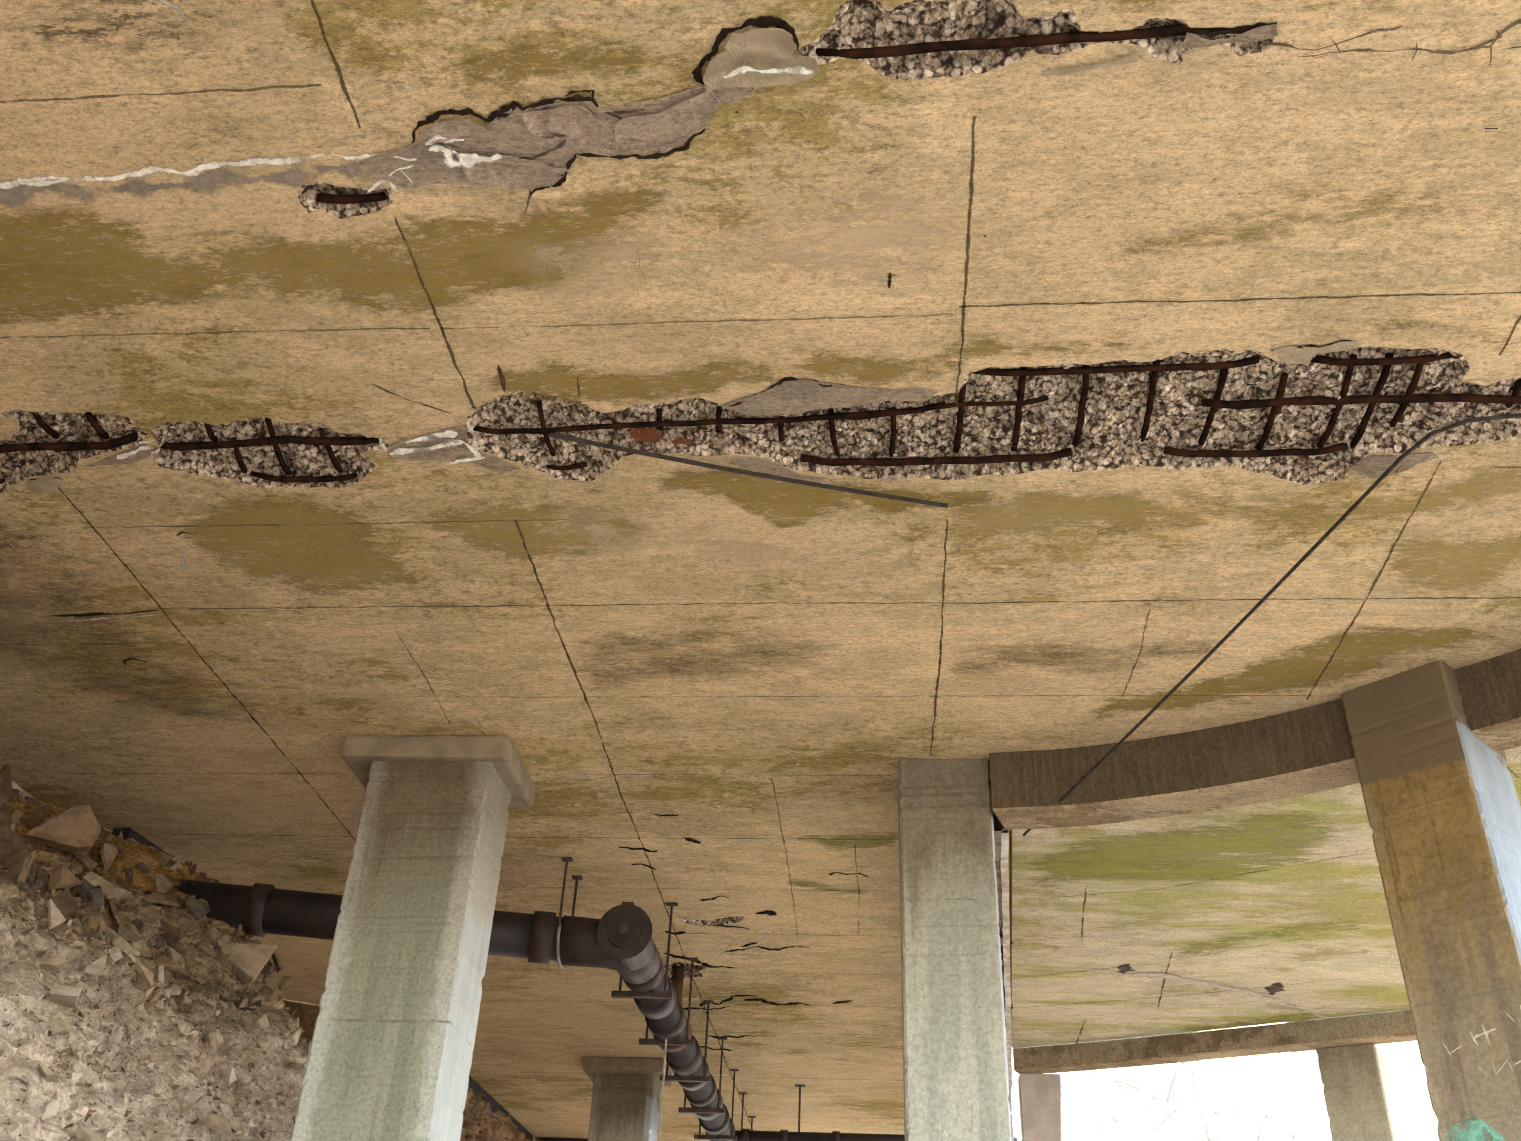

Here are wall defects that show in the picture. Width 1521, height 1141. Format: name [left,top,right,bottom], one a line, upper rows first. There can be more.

spalling [725,0,1274,80]
crack [1179,19,1521,64]
peeling [298,86,754,219]
water stain [0,163,668,324]
spalling [0,340,1521,495]
water stain [184,498,416,595]
crack [999,921,1013,1027]